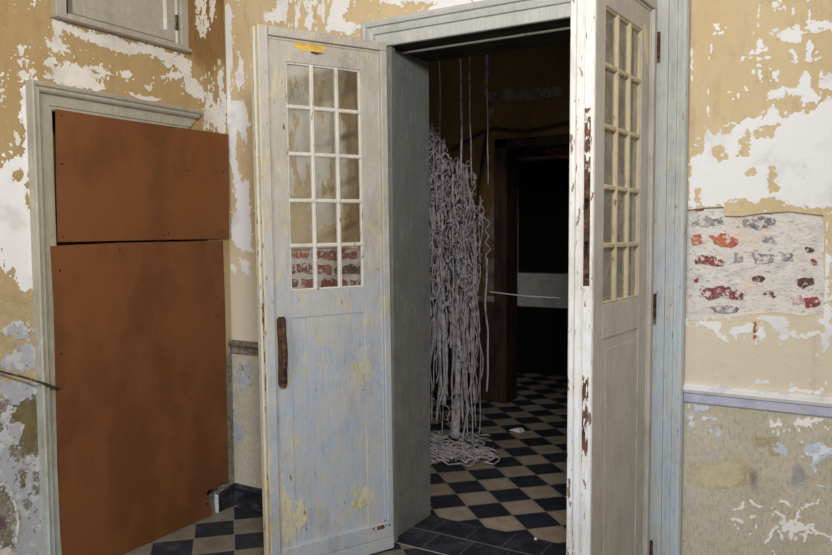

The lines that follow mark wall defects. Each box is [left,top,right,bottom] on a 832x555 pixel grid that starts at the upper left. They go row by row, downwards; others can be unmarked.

peeling [294,42,327,55]
peeling [263,0,361,36]
peeling [370,0,483,14]
peeling [0,0,255,292]
peeling [287,65,349,232]
flaking render [291,248,361,289]
peeling [483,201,494,296]
peeling [0,320,42,555]
peeling [233,360,253,449]
peeling [685,404,722,437]
peeling [769,416,832,473]
peeling [278,445,308,548]